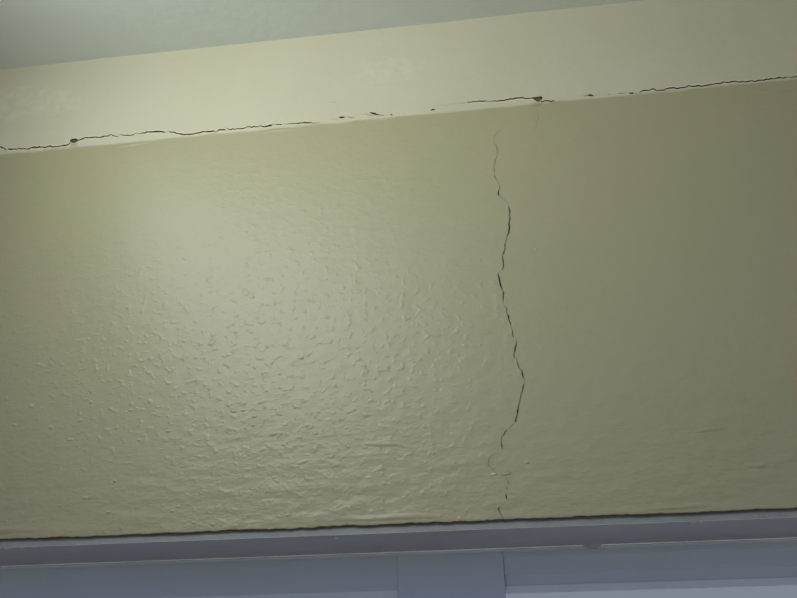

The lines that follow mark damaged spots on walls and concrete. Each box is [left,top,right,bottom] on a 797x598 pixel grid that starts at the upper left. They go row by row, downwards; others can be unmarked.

crack [466,96,555,104]
crack [618,75,797,94]
crack [0,120,320,152]
crack [494,176,524,447]